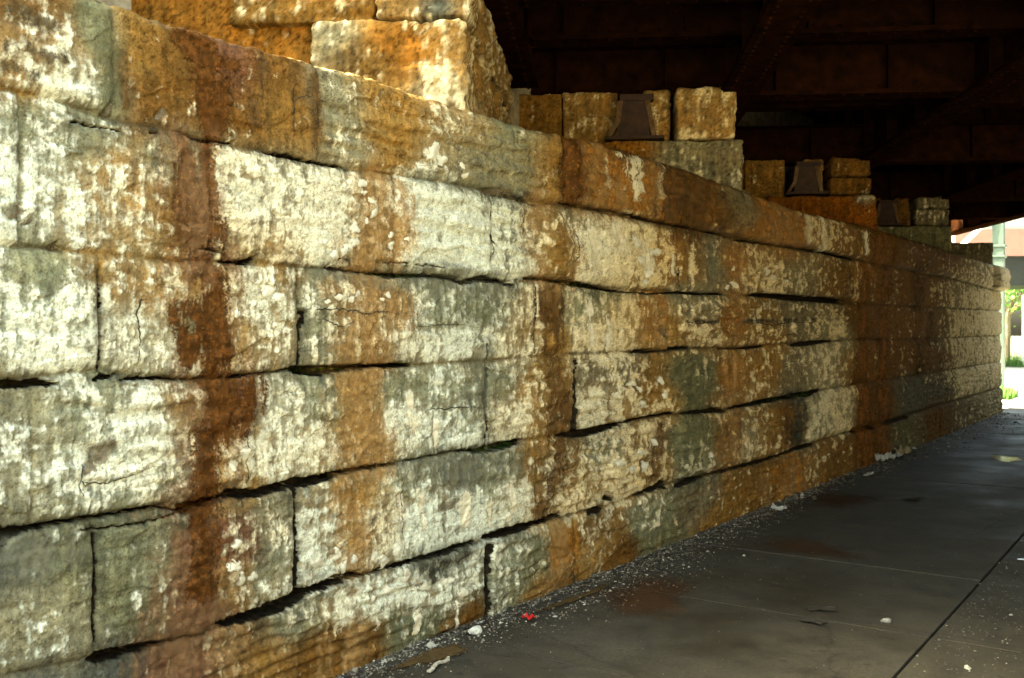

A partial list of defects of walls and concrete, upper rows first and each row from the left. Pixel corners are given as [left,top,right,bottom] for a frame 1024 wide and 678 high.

corrosion [310,69,323,154]
crack [134,298,146,364]
corrosion [167,26,269,606]
corrosion [313,158,417,579]
crack [317,308,474,327]
corrosion [519,136,627,523]